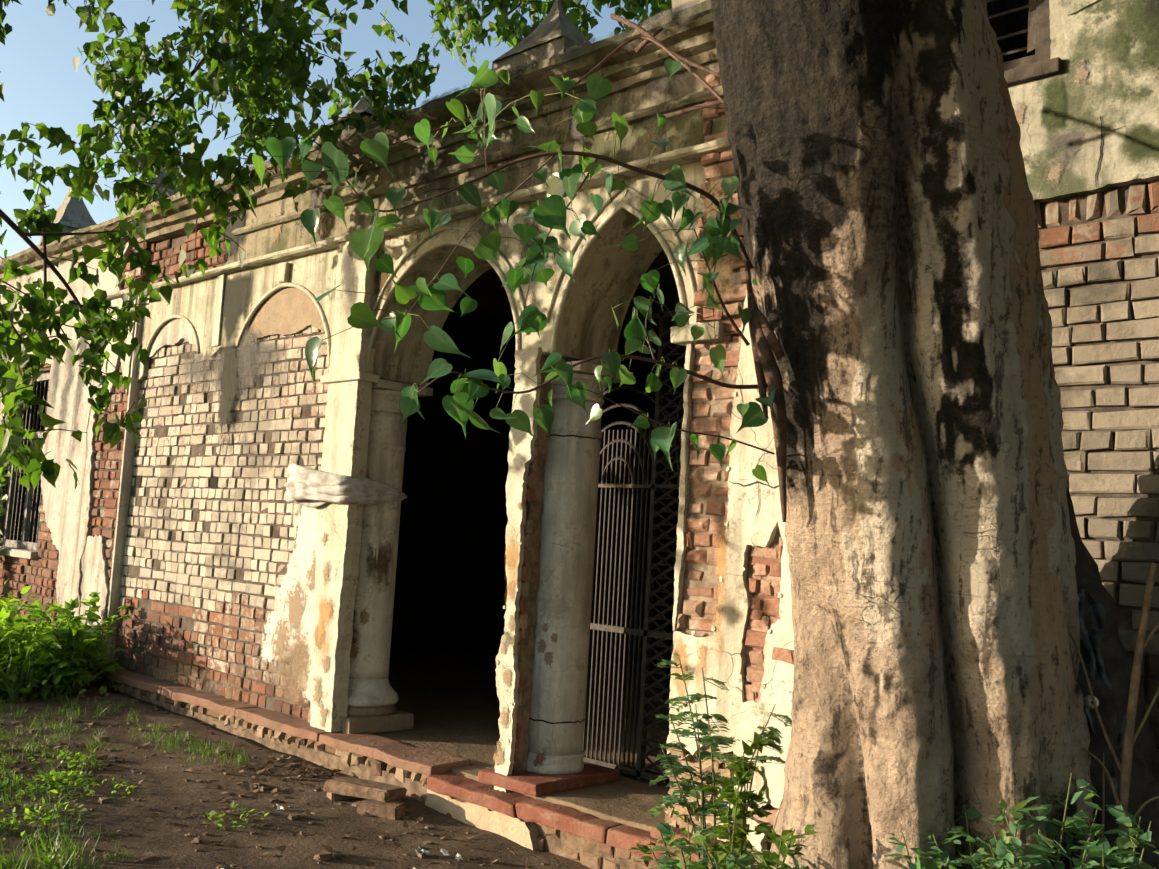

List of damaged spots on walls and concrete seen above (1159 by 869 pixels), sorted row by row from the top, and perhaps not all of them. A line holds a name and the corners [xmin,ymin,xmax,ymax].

damp [1111,0,1159,78]
damp [1050,131,1082,162]
peeling [271,532,335,728]
spalling [738,543,783,701]